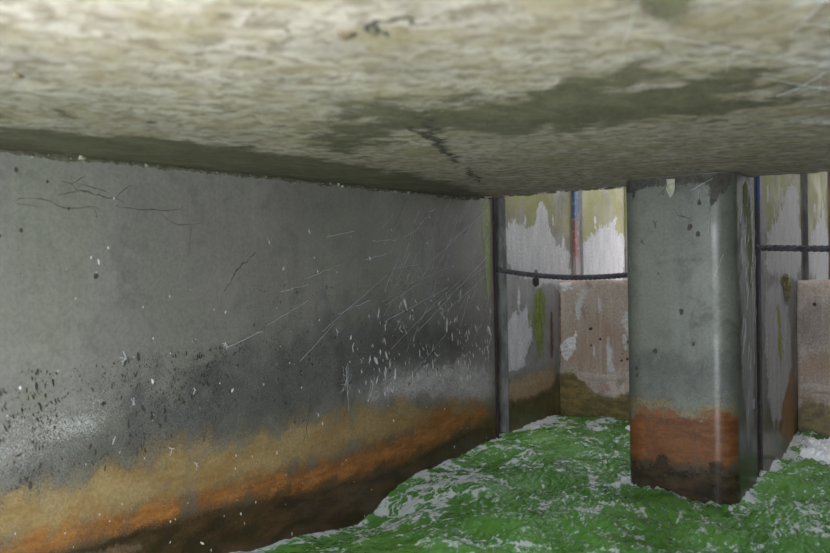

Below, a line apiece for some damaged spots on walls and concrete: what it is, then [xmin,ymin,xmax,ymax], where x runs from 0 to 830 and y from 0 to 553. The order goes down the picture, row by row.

crack [14,177,198,255]
water stain [0,58,830,240]
water stain [626,173,756,454]
water stain [0,278,496,553]
corrosion [629,399,740,474]